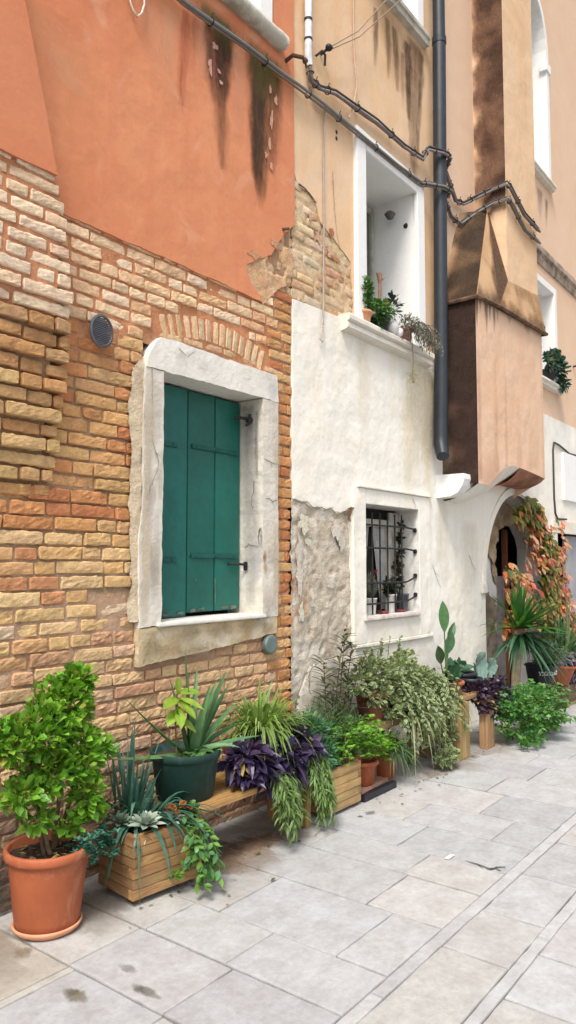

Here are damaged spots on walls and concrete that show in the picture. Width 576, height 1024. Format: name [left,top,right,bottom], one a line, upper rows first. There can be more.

leakage [203,6,231,94]
leakage [250,44,279,185]
leakage [375,12,421,96]
peeling [246,181,353,316]
crack [148,367,160,495]
flaking render [289,496,354,723]